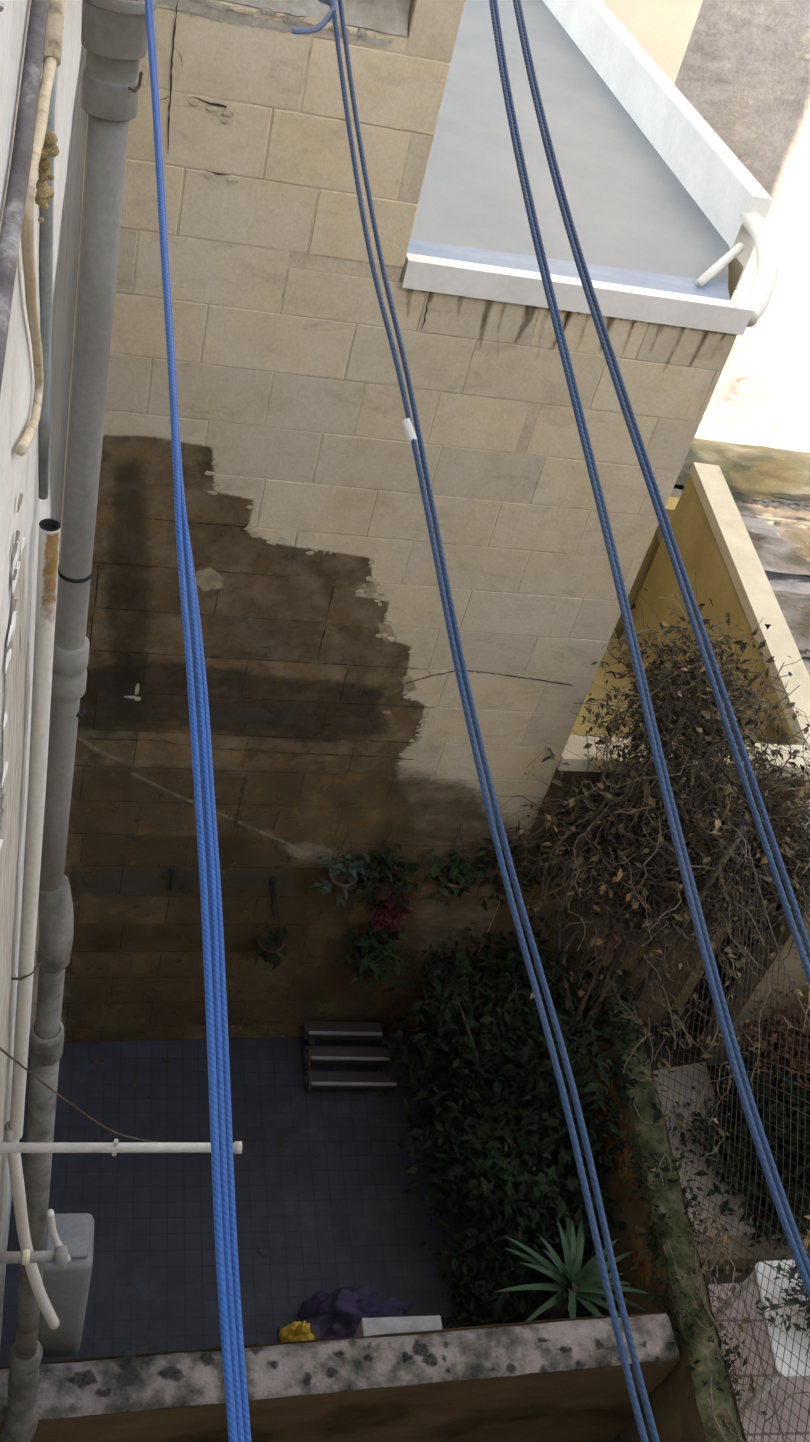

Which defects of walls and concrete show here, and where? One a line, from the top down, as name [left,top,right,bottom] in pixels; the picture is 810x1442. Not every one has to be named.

leakage [519,305,536,335]
crack [90,738,414,832]
leakage [62,436,521,1042]